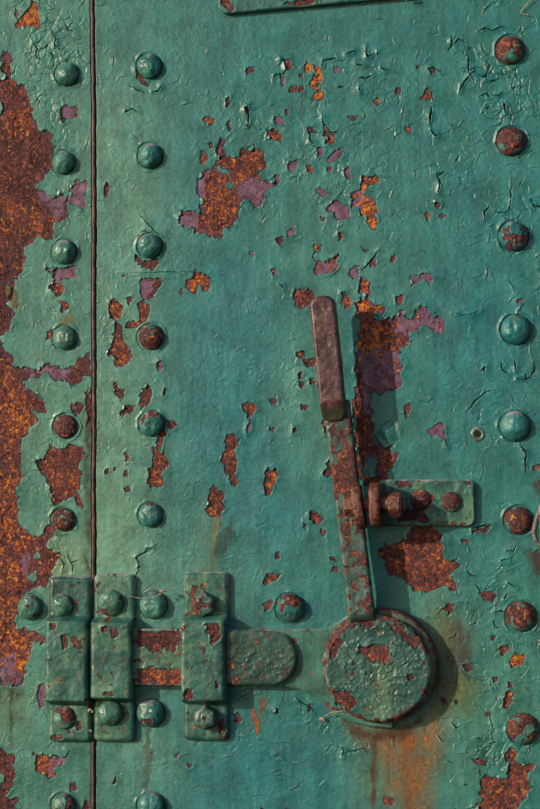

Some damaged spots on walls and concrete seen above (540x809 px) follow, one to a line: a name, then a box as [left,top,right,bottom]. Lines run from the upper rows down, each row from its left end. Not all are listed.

crack [448,27,506,111]
peeling [317,148,344,172]
peeling [316,174,380,230]
peeling [46,265,77,313]
peeling [127,276,163,305]
corrosion [0,51,92,701]
peeling [340,247,447,488]
corrosion [330,639,344,659]
corrosion [356,643,393,664]
corrosion [334,689,357,710]
peeling [33,752,69,779]
corrosion [344,717,437,809]